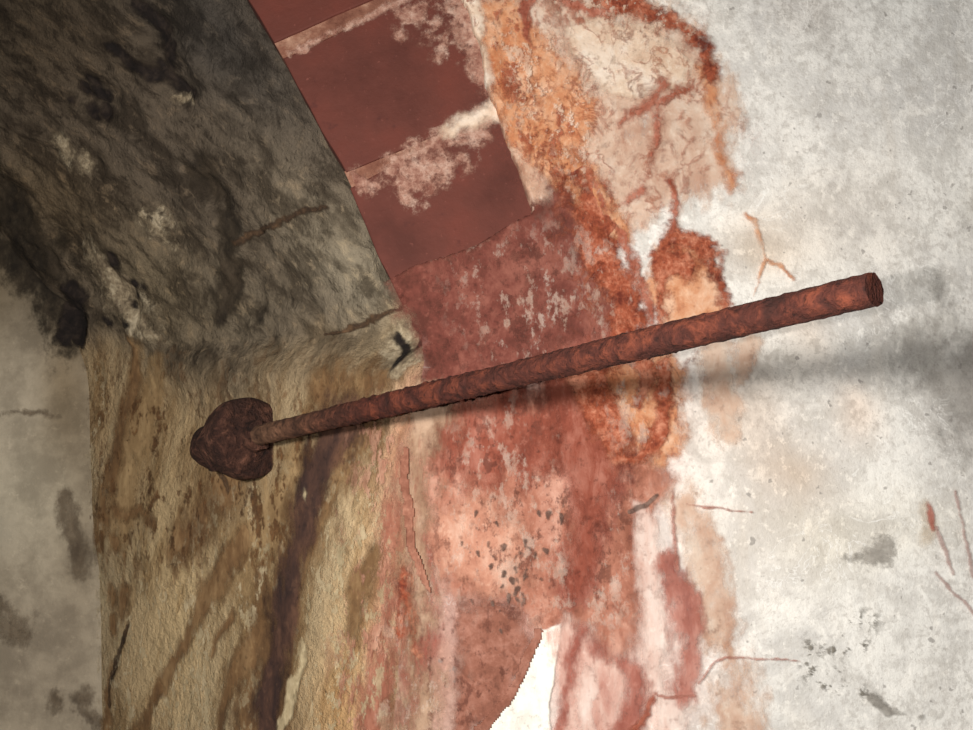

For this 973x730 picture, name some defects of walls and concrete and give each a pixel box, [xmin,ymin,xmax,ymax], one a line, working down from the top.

peeling [461,0,494,88]
water stain [0,175,83,357]
water stain [182,154,250,326]
crack [233,205,328,246]
corrosion [463,0,740,337]
crack [746,214,793,279]
water stain [99,396,167,459]
corrosion [566,354,687,466]
water stain [123,419,389,730]
corrosion [341,403,451,730]
spalling [454,539,625,730]
corrosion [657,493,763,730]